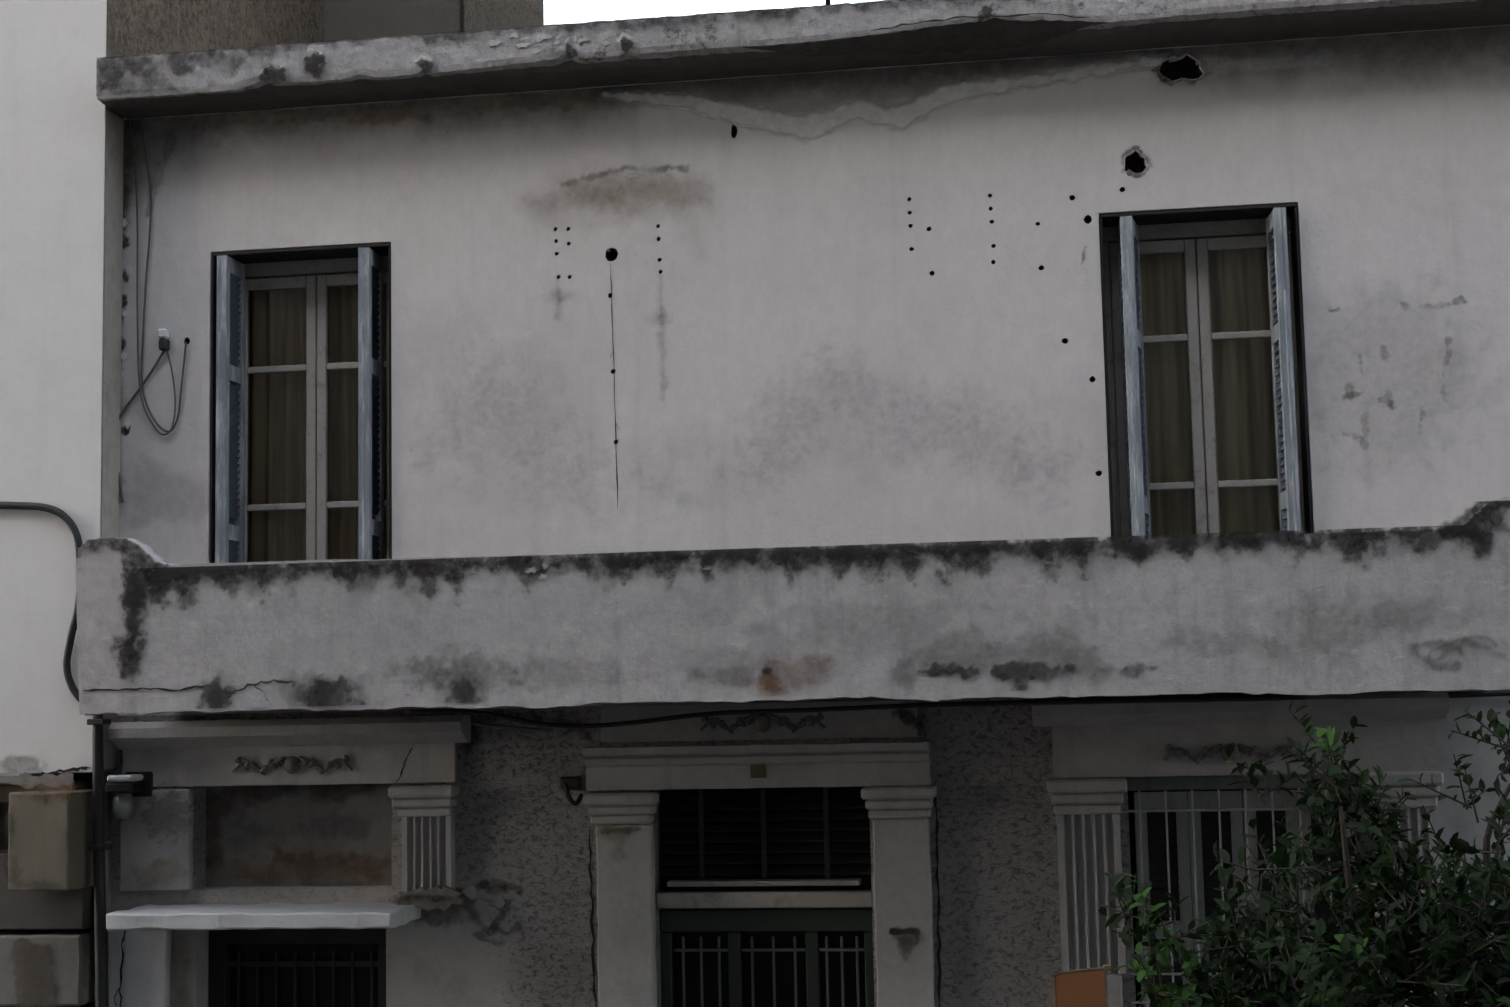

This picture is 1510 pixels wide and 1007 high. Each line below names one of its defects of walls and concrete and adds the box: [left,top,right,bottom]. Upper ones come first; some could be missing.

spalling [259,66,286,84]
spalling [303,48,326,79]
spalling [414,55,434,73]
crack [610,266,619,508]
damp [77,500,1510,678]
crack [83,679,294,709]
damp [201,677,236,708]
damp [291,675,363,706]
corrosion [759,667,777,692]
damp [452,677,590,752]
flaking render [389,881,520,939]
flaking render [889,928,920,956]